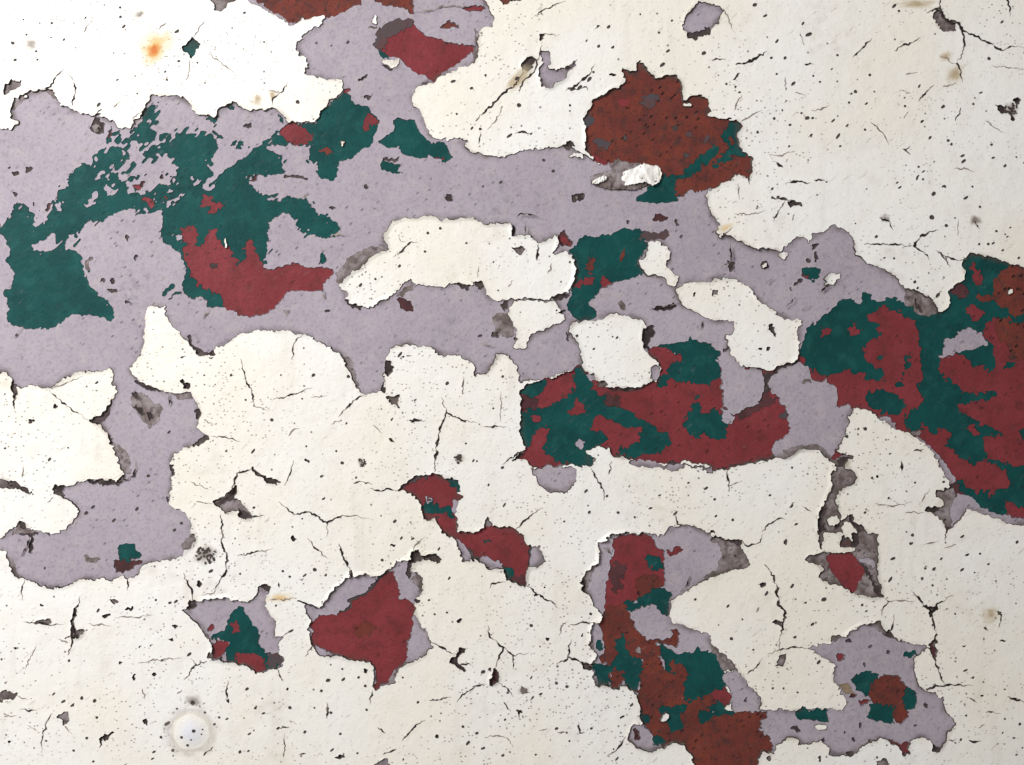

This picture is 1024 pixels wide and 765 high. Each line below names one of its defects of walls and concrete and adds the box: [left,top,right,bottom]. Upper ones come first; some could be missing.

crack [895,0,1023,121]
peeling [0,0,1024,597]
crack [867,217,980,265]
crack [373,376,502,472]
crack [26,597,150,655]
crack [183,469,273,600]
peeling [184,585,284,673]
crack [252,464,361,577]
peeling [298,550,439,690]
crack [378,627,525,755]
peeling [581,525,955,765]
crack [743,502,810,675]